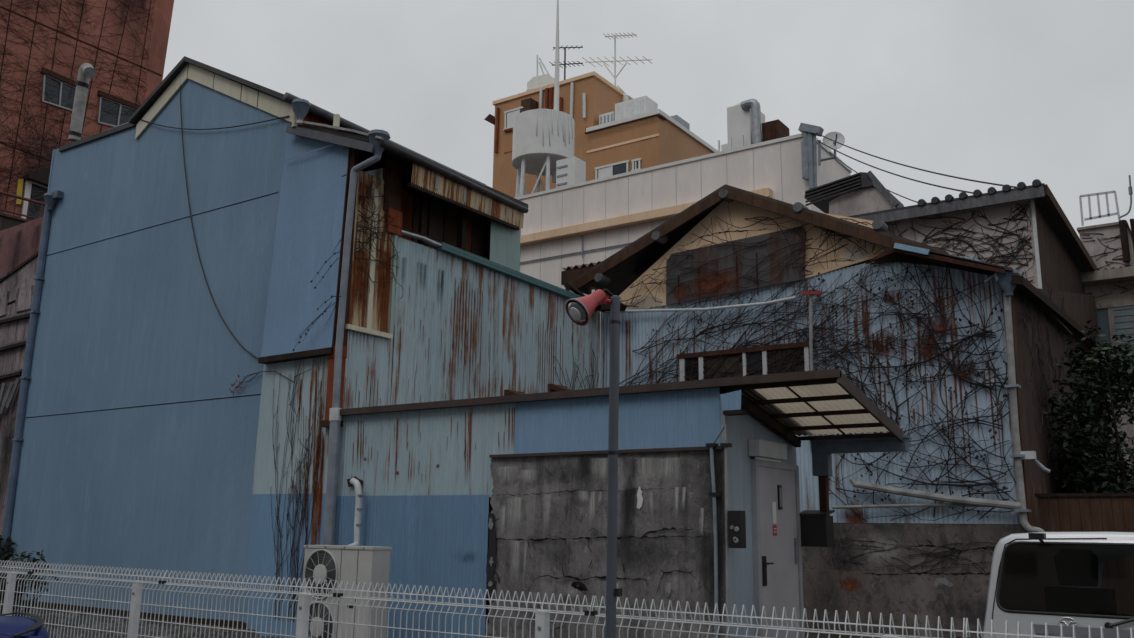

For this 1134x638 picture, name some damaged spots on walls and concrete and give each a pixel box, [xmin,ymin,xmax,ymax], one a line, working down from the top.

rust [353,180,391,310]
rust [414,279,495,390]
rust [292,368,324,545]
rust [344,325,401,464]
rust [394,420,421,479]
rust [447,413,476,467]
crack [493,489,714,604]
water stain [580,458,686,559]
water stain [701,461,723,605]